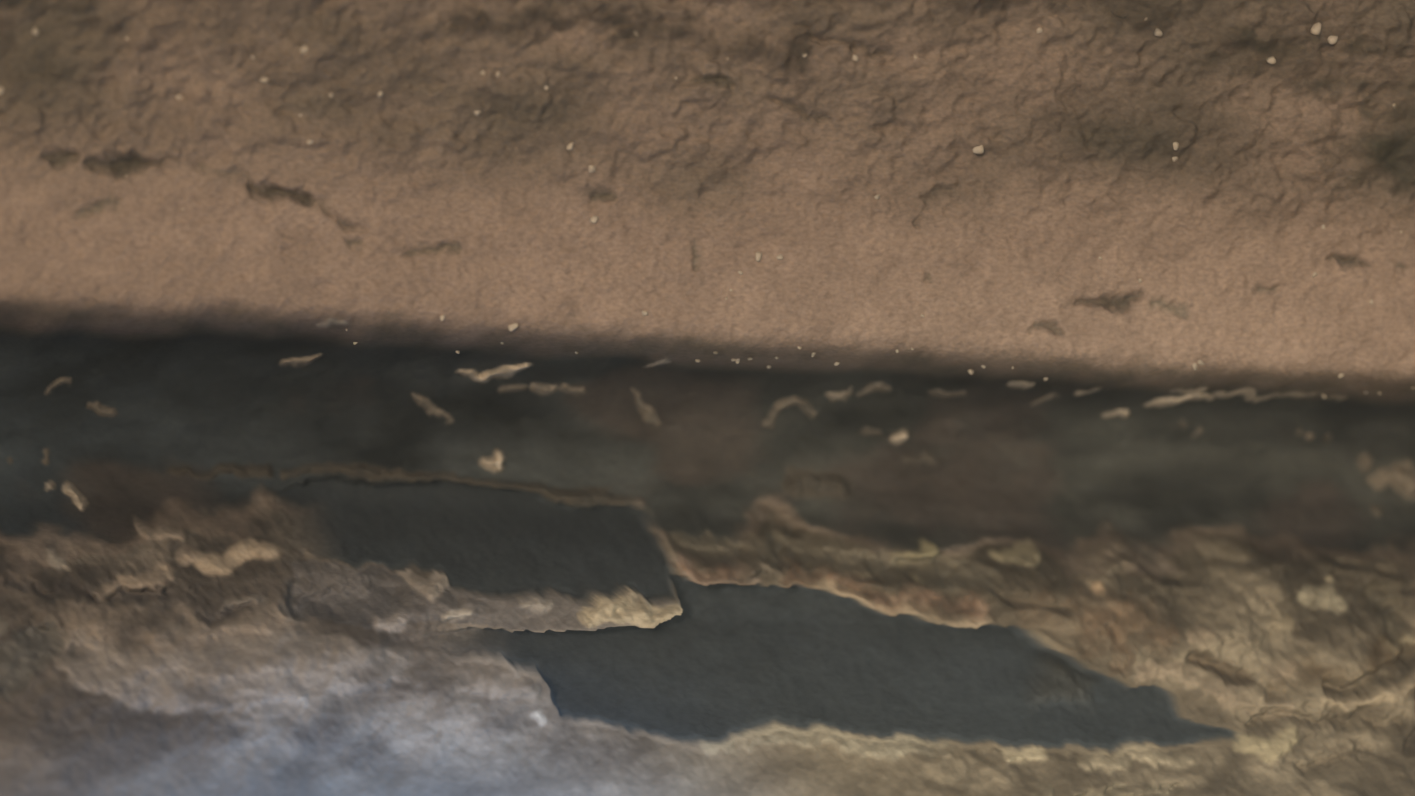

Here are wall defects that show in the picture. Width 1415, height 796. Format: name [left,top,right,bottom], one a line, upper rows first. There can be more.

spalling [0,477,1415,796]
crack [1246,645,1415,778]